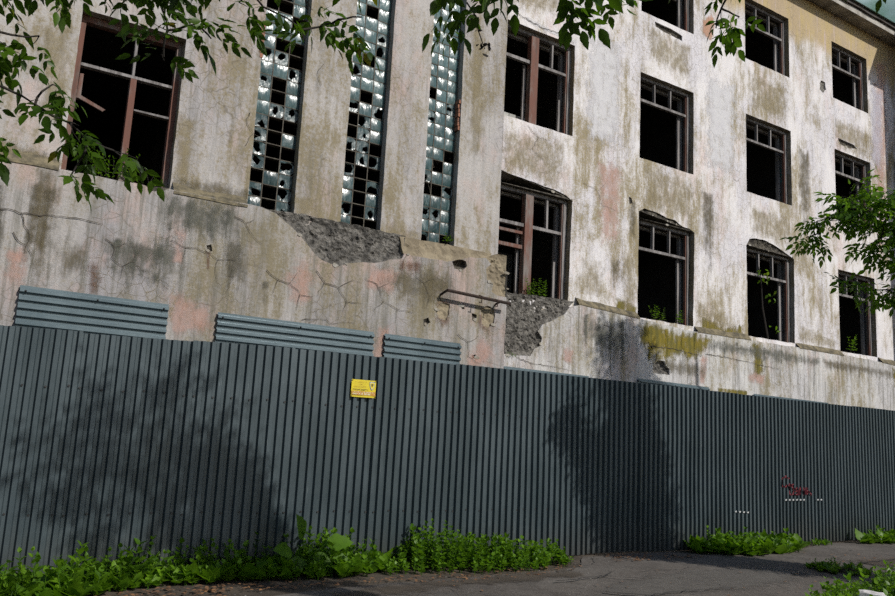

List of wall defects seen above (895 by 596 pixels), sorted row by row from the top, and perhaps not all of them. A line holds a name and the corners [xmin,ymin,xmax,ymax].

water stain [27,174,55,249]
water stain [169,196,234,237]
water stain [111,239,174,274]
flaking render [267,200,574,357]
water stain [648,326,703,374]